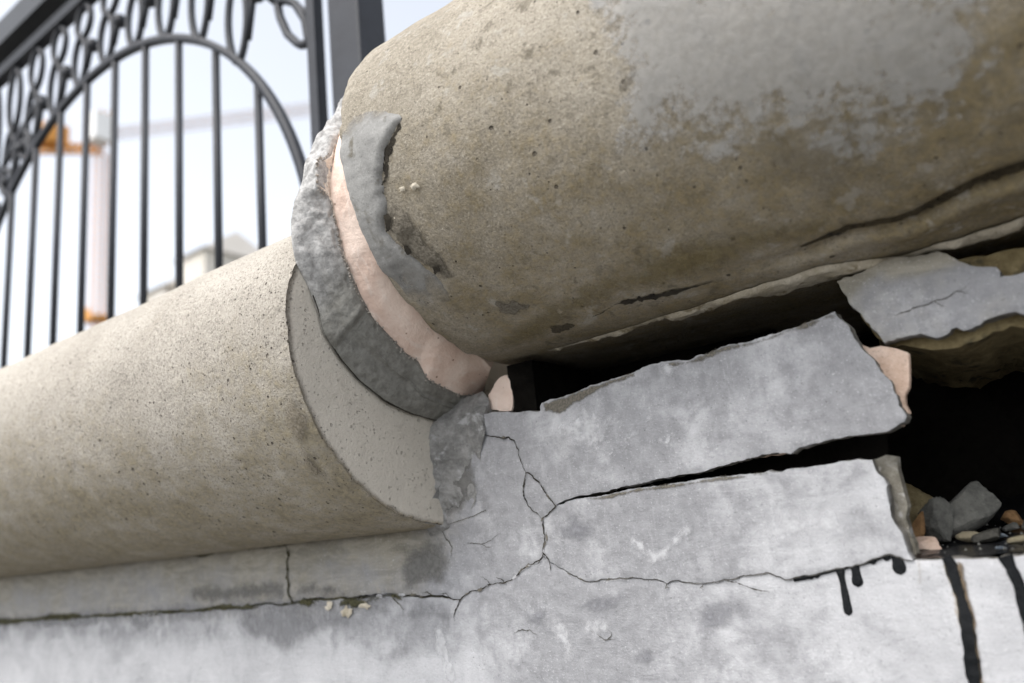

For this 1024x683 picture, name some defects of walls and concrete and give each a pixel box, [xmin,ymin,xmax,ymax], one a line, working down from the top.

damp [592,0,974,155]
spalling [314,153,474,397]
crack [593,282,711,317]
crack [800,162,1024,247]
crack [895,289,969,316]
crack [0,433,913,621]
spalling [484,312,942,583]
spalling [1001,510,1023,526]